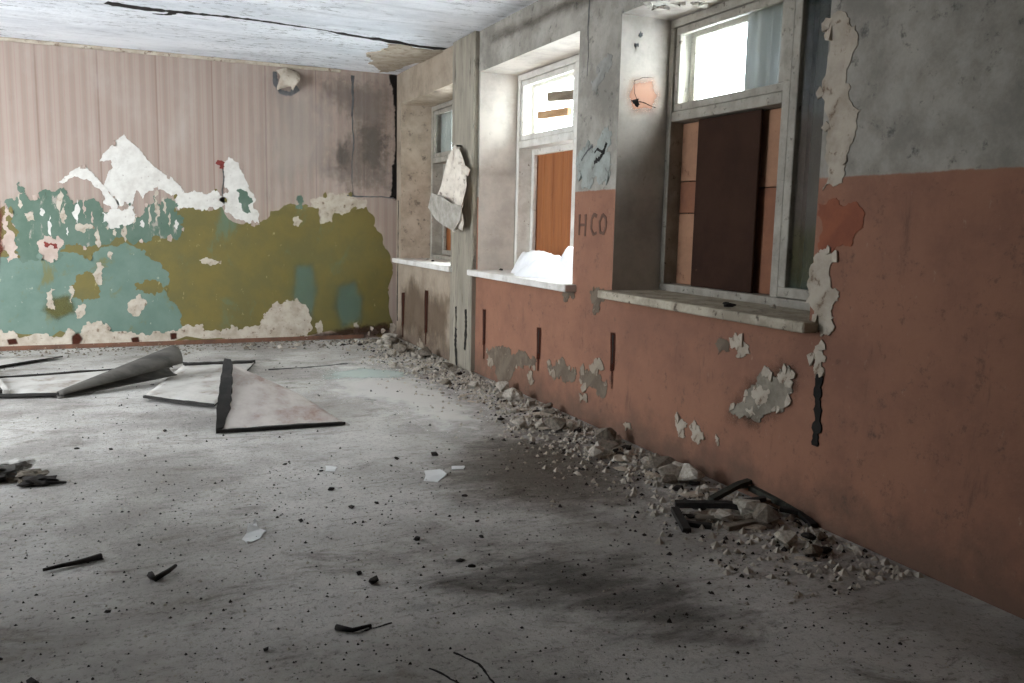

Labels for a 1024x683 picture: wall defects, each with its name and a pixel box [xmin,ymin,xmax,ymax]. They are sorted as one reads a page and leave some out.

peeling [805,10,865,378]
peeling [0,173,396,347]
spalling [486,345,607,403]
peeling [714,333,750,358]
spalling [729,363,797,423]
peeling [675,412,720,446]